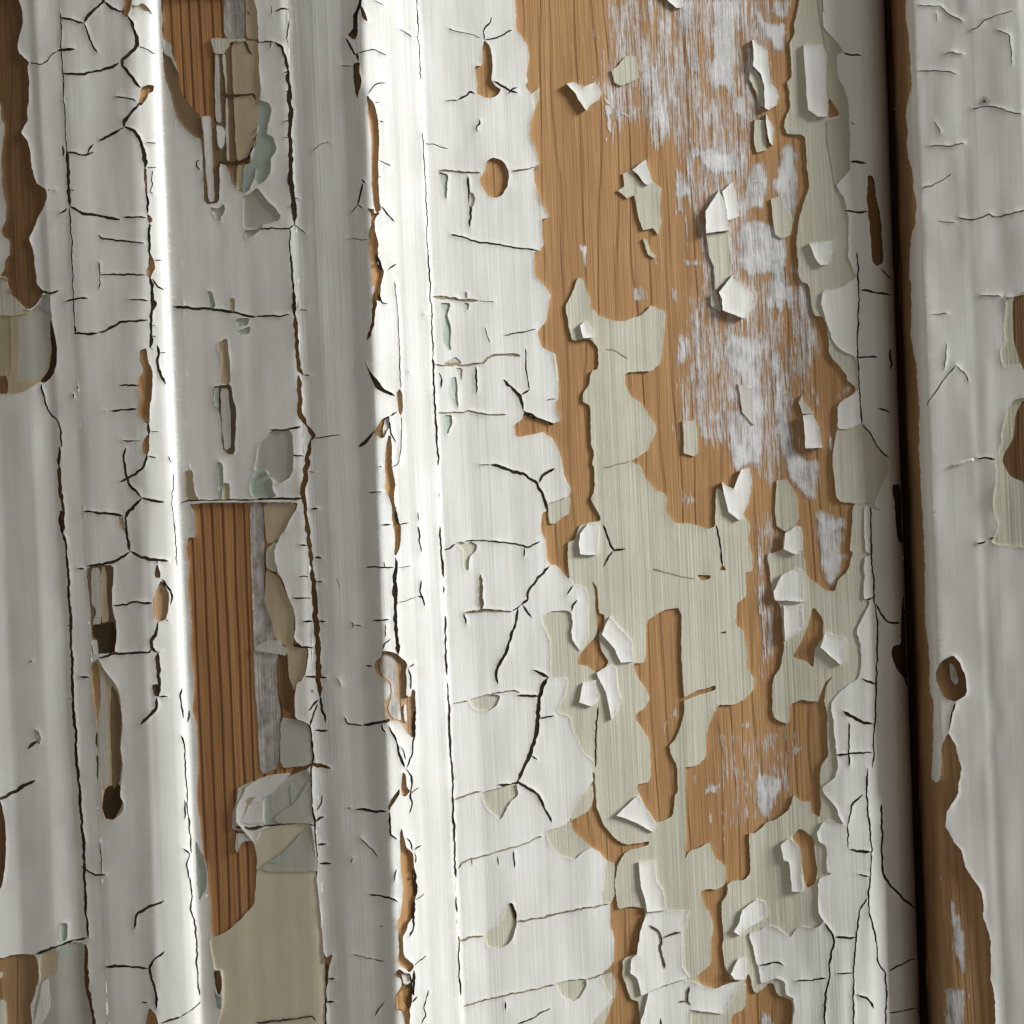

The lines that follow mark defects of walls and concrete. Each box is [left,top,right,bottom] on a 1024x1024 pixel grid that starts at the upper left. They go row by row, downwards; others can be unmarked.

peeling [0,0,57,395]
peeling [122,0,280,238]
peeling [469,158,509,207]
crack [920,5,1012,74]
crack [939,210,1024,223]
crack [29,0,555,1024]
peeling [514,0,996,1024]
crack [0,780,36,800]
peeling [87,565,124,820]
peeling [184,298,333,1024]
crack [517,904,608,923]
crack [759,506,916,1024]